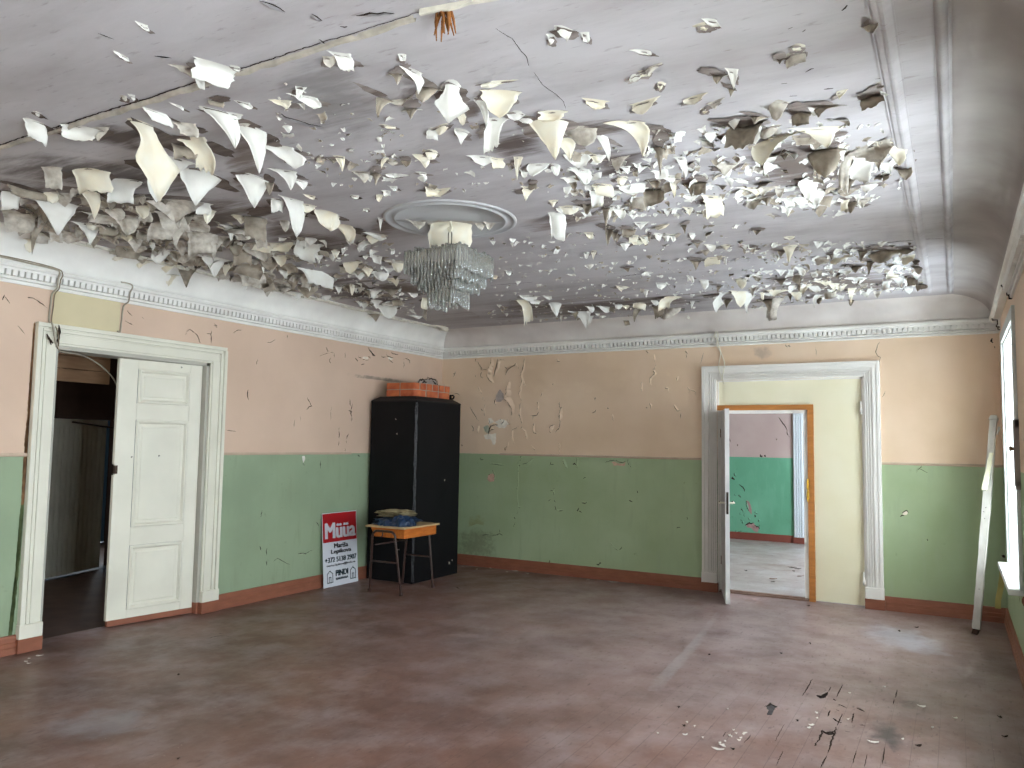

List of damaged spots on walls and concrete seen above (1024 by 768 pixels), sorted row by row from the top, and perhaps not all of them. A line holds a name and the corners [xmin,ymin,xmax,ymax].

crack [497,29,566,109]
peeling [546,25,592,47]
peeling [692,18,721,33]
peeling [772,43,808,69]
peeling [860,19,878,33]
peeling [0,49,937,331]
spalling [475,358,519,445]
spalling [732,473,761,532]